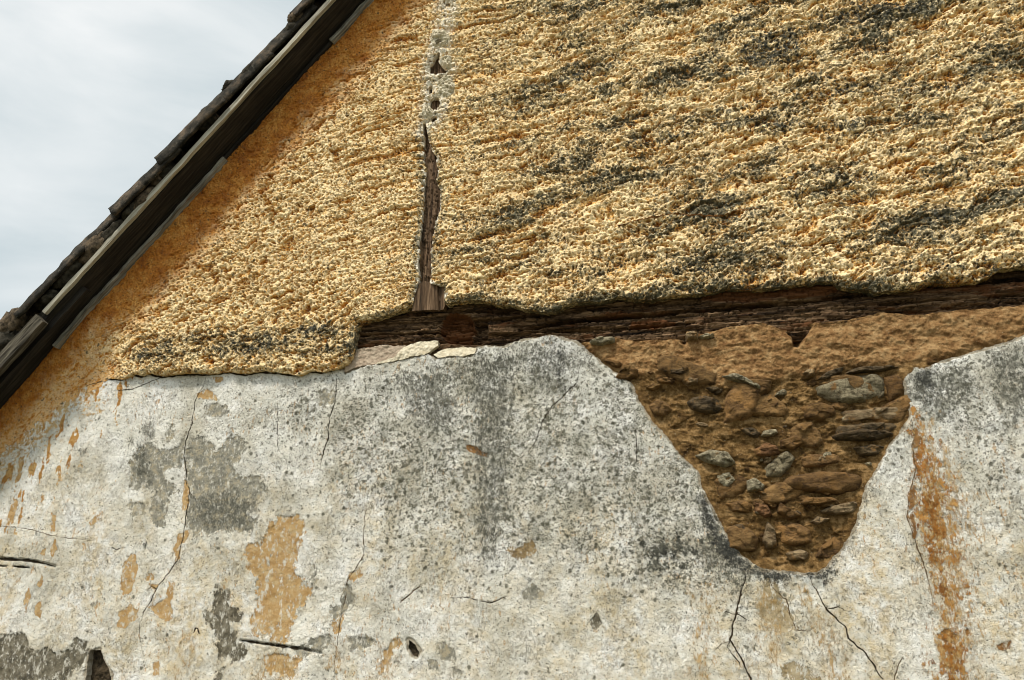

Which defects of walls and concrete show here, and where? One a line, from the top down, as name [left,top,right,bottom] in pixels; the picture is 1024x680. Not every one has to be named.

peeling [197,377,229,418]
water stain [128,421,155,483]
spalling [581,305,1024,633]
peeling [7,498,18,524]
crack [86,360,337,649]
water stain [192,483,262,533]
peeling [127,424,463,680]
peeling [23,575,43,619]
peeling [117,553,175,628]
peeling [522,583,544,600]
crack [716,576,903,680]
peeling [780,661,821,680]